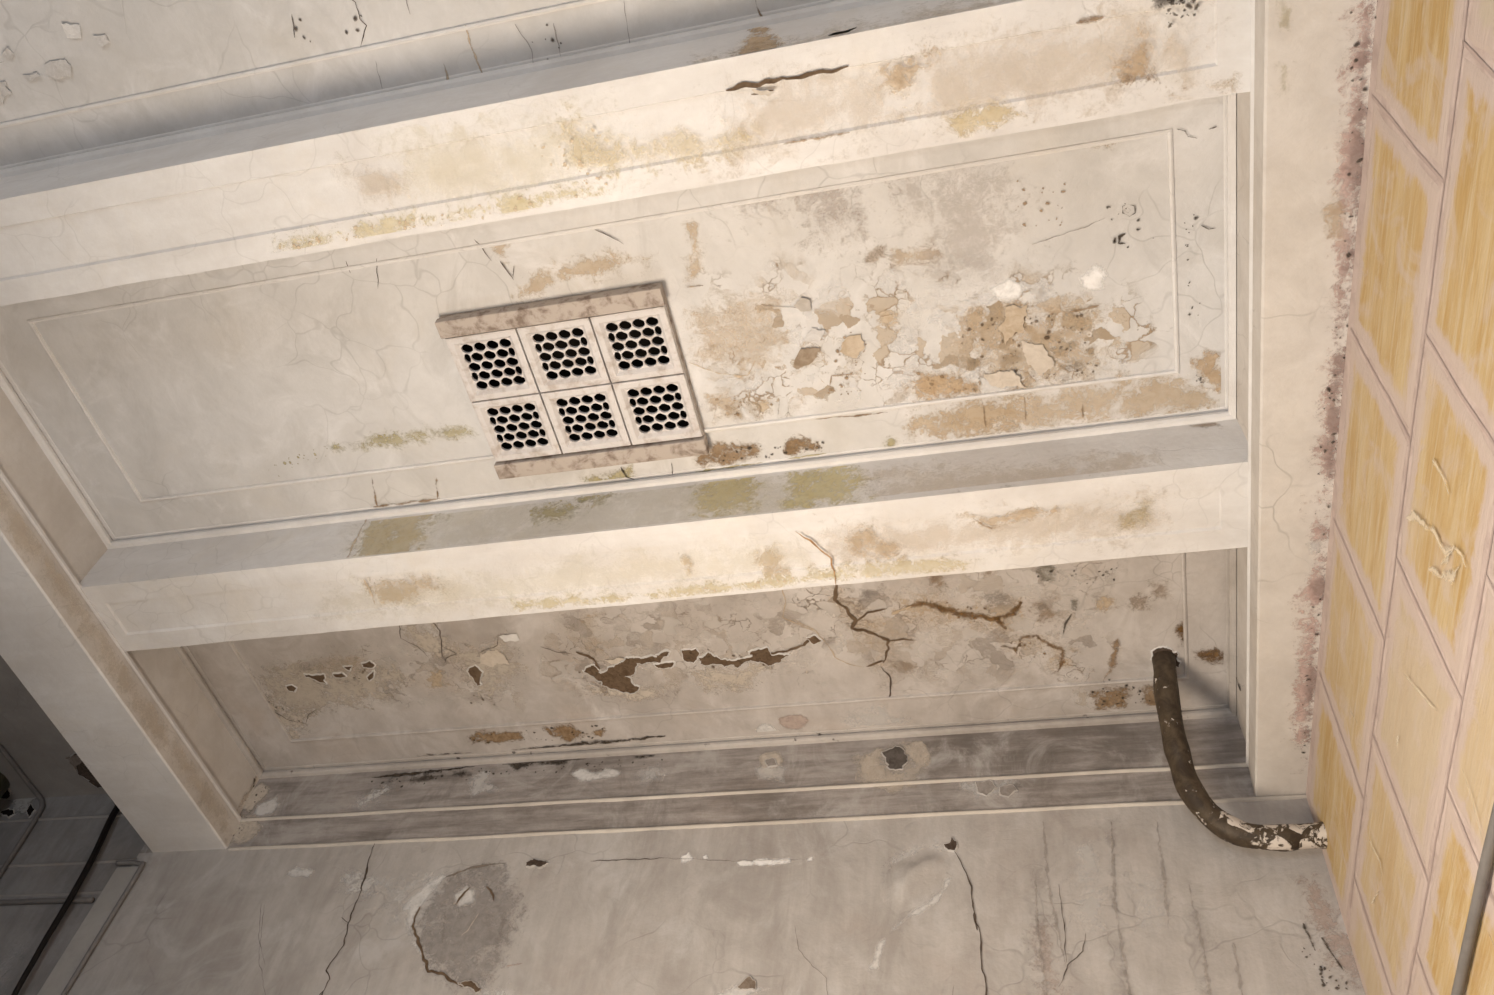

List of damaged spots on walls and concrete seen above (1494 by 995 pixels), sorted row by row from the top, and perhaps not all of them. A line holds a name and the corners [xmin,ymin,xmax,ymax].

water stain [731,8,779,56]
water stain [1156,0,1199,28]
peeling [726,66,848,96]
peeling [689,263,979,416]
water stain [1293,1,1378,753]
water stain [694,439,861,517]
water stain [347,479,440,558]
flaking render [543,625,823,701]
flaking render [65,752,103,788]
crack [319,843,378,995]
flaking render [382,863,522,995]
crack [943,837,987,995]